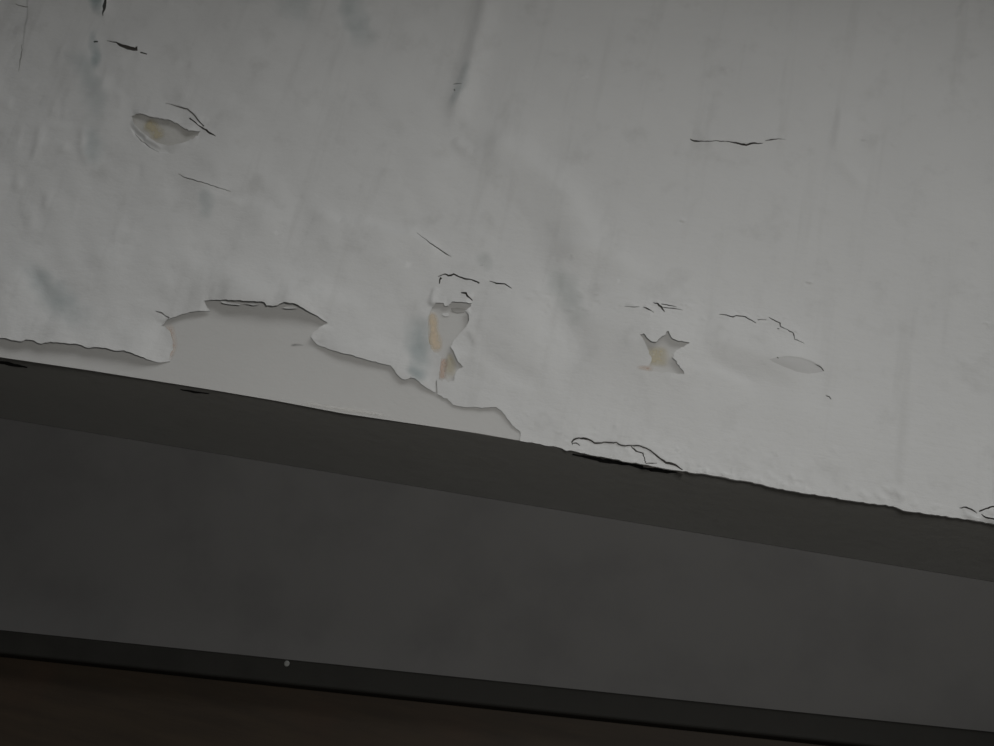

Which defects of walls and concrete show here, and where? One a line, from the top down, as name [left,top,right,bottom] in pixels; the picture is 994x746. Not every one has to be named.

peeling [127,101,215,158]
crack [690,138,776,146]
crack [627,303,680,313]
crack [720,314,798,341]
peeling [0,271,535,441]
peeling [631,323,695,379]
crack [572,454,678,473]